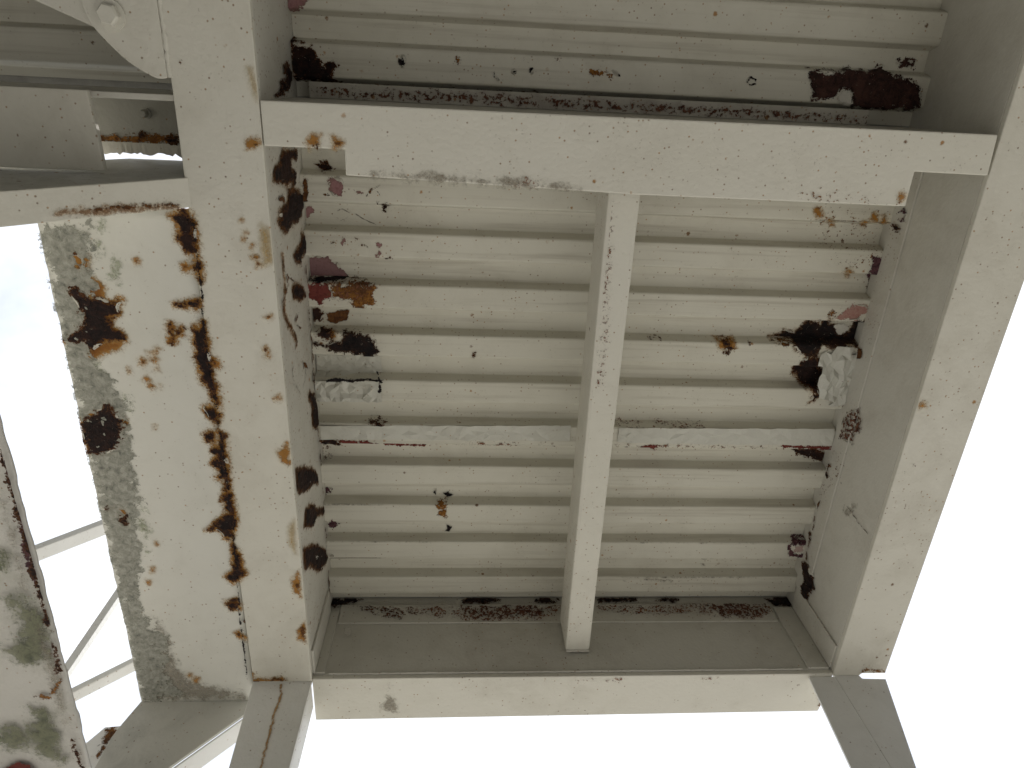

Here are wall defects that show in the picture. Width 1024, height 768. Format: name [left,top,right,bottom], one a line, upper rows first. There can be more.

rust [275,32,923,124]
rust [62,252,128,359]
rust [55,203,204,283]
peeling [308,256,349,283]
rust [78,404,129,455]
rust [126,299,247,582]
rust [272,133,560,621]
rust [781,406,862,600]